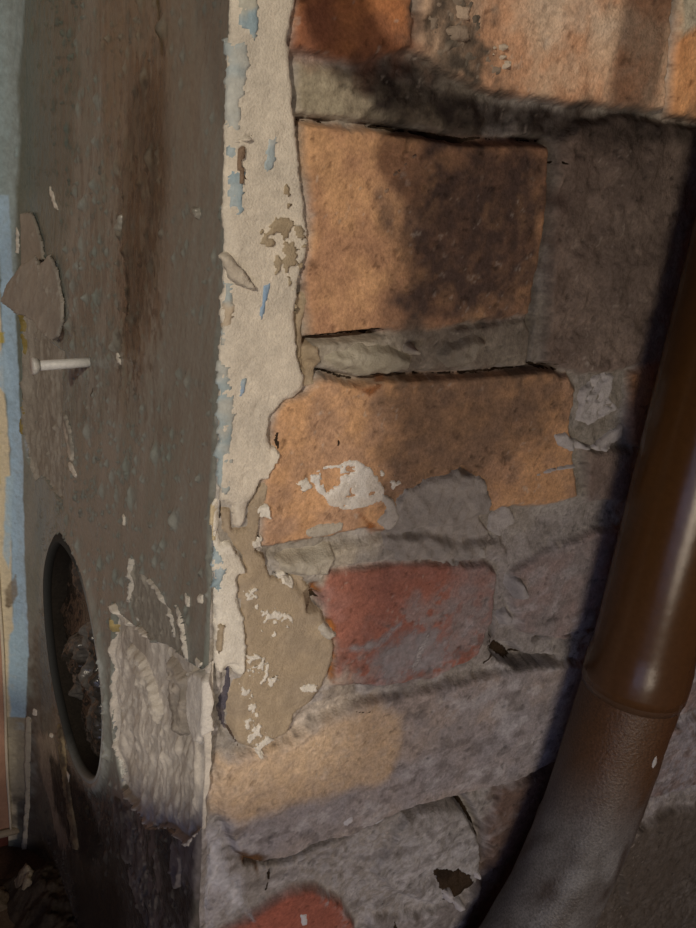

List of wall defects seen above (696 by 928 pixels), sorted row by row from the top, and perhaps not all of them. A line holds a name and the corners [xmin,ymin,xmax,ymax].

spalling [1,212,77,499]
peeling [107,0,336,928]